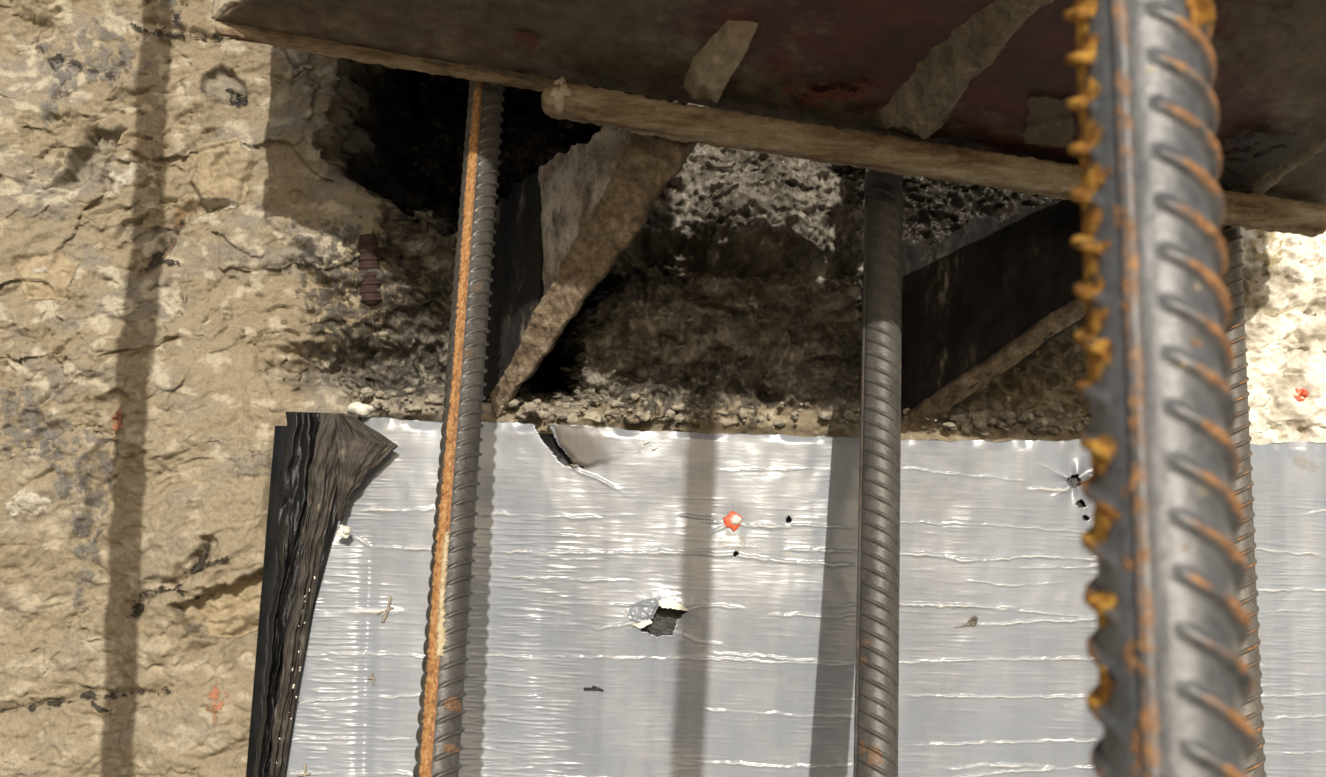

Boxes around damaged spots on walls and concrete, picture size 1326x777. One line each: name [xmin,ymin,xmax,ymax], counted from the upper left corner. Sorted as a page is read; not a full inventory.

peeling [721,89,911,139]
rust [1243,228,1296,268]